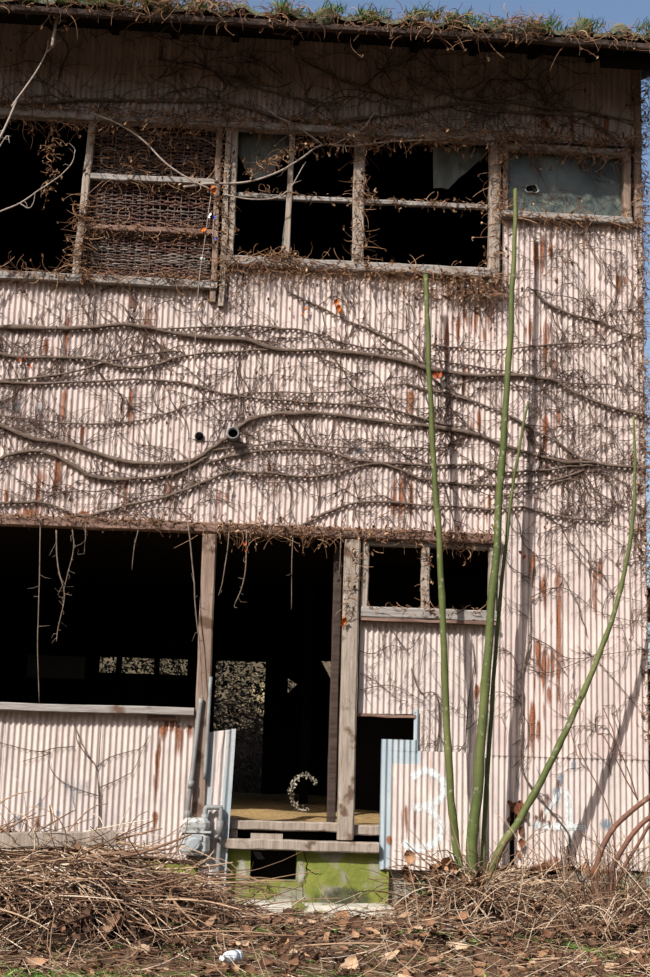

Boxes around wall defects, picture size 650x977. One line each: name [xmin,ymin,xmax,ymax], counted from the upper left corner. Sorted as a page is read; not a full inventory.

corrosion [533,234,552,272]
corrosion [61,388,84,445]
corrosion [391,476,413,516]
corrosion [593,559,602,615]
corrosion [528,554,562,745]
corrosion [154,720,192,793]
corrosion [507,780,561,858]
leakage [321,888,368,904]